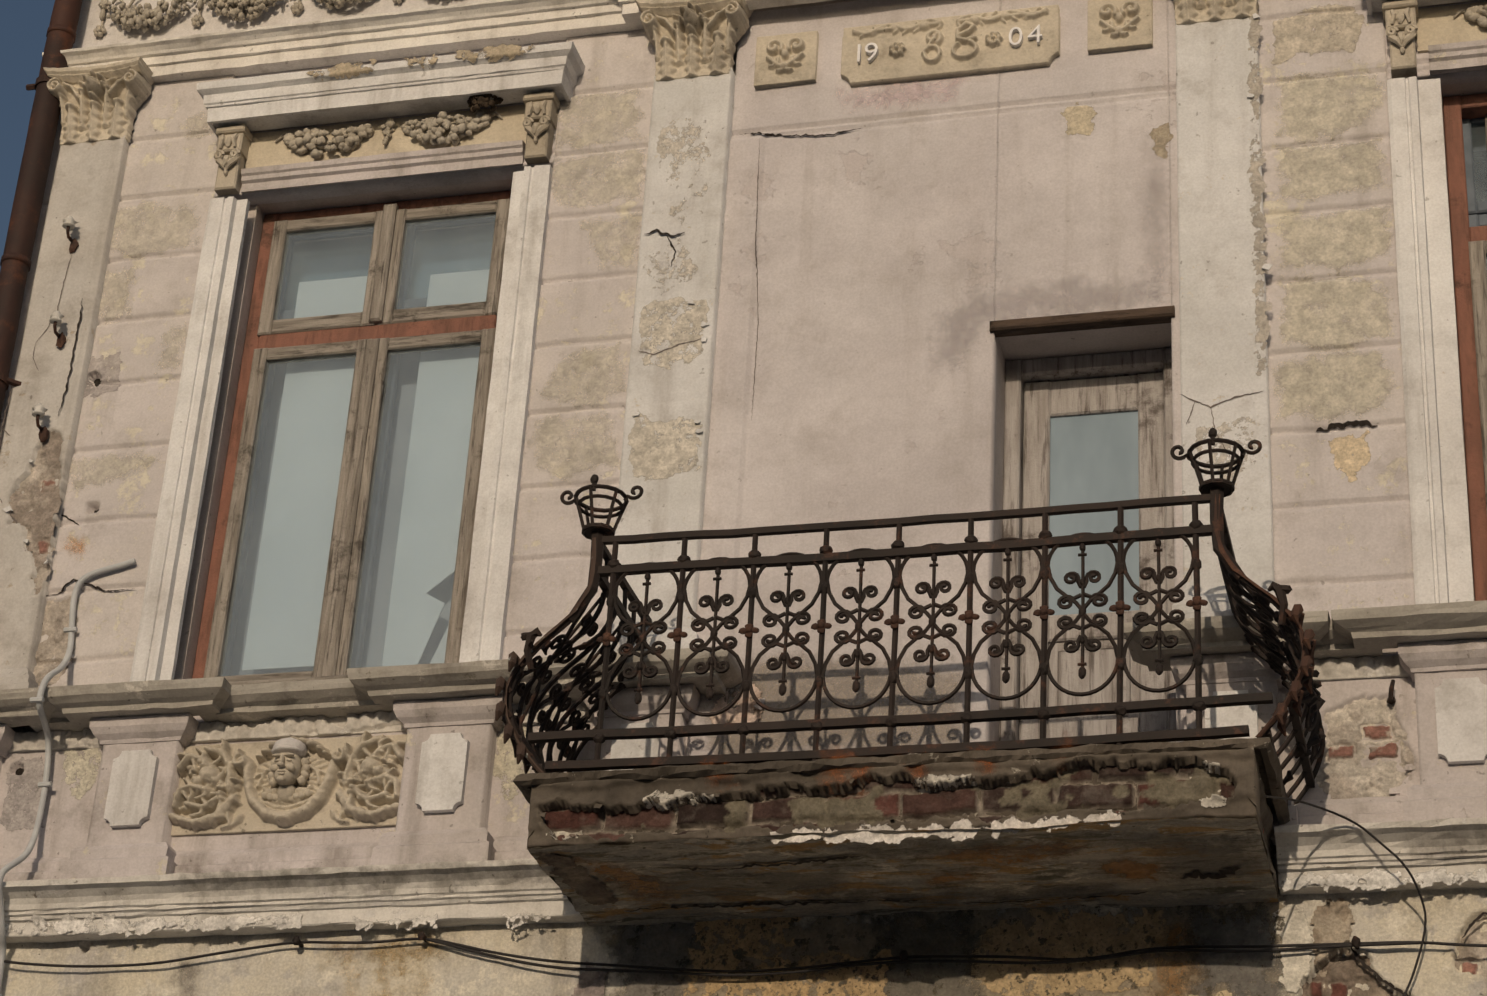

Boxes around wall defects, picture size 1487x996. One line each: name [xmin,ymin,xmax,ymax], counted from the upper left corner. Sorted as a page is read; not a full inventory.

spalling [3,431,78,686]
spalling [536,760,1236,905]
peeling [5,910,302,937]
peeling [353,914,438,931]
peeling [502,913,551,929]
spalling [556,961,609,996]
peeling [684,917,892,996]
peeling [971,907,1178,996]
peeling [1272,867,1487,996]